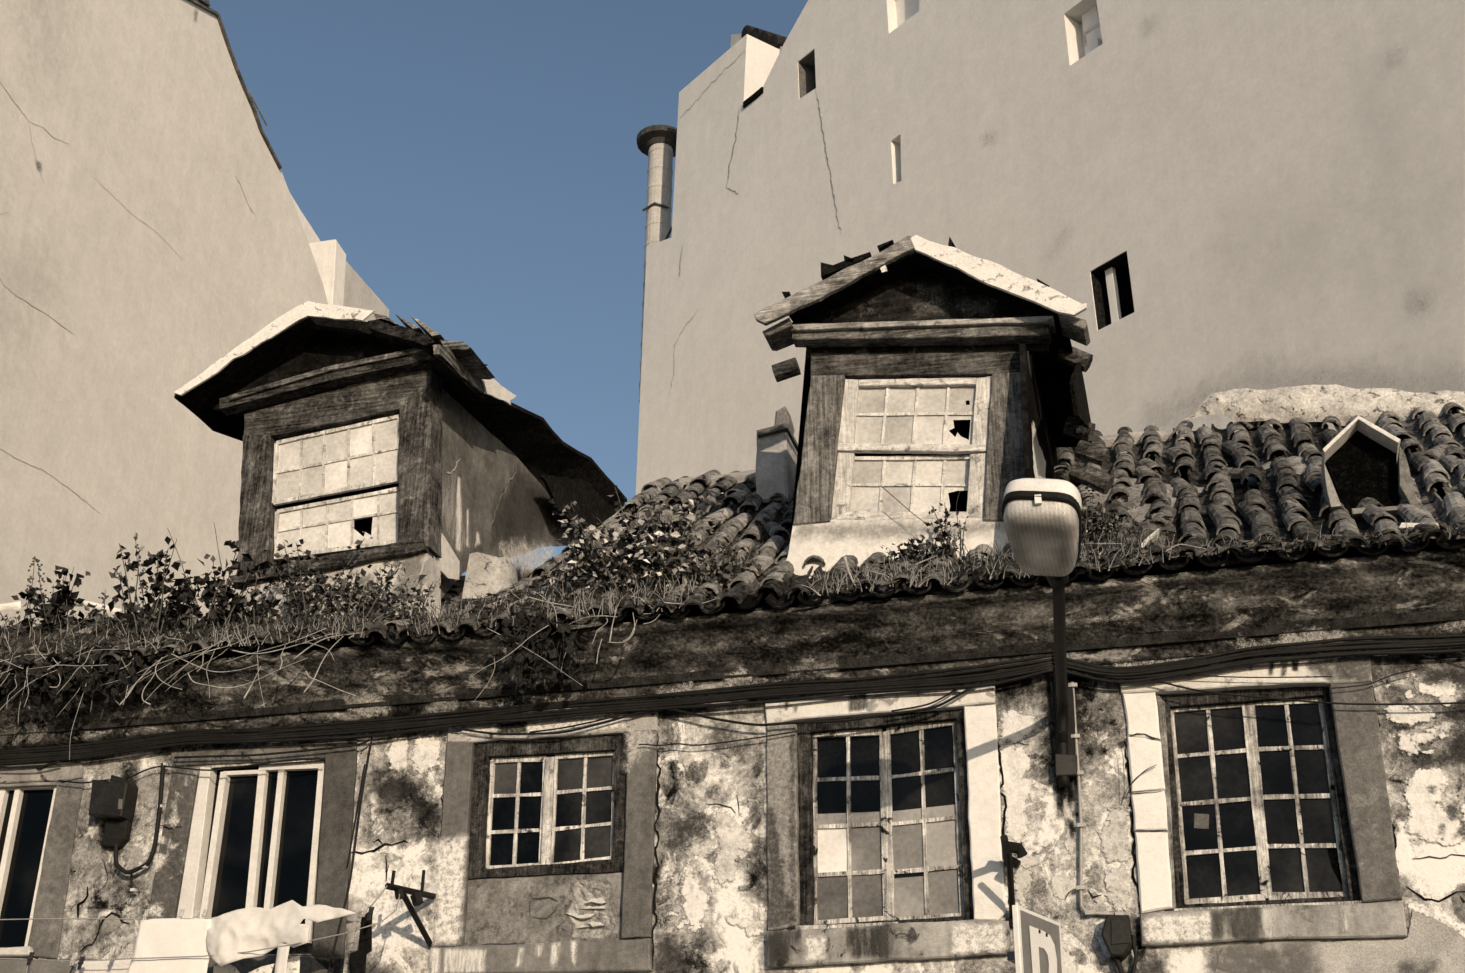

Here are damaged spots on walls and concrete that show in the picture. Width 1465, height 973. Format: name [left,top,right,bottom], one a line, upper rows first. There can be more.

crack [0,82,69,182]
crack [681,52,743,194]
crack [815,92,841,229]
flaking render [386,735,442,774]
damp [714,726,750,761]
damp [849,694,867,710]
flaking render [1384,678,1465,846]
flaking render [667,809,765,948]
damp [765,808,826,965]
damp [1111,906,1320,973]
spalling [1408,886,1465,937]